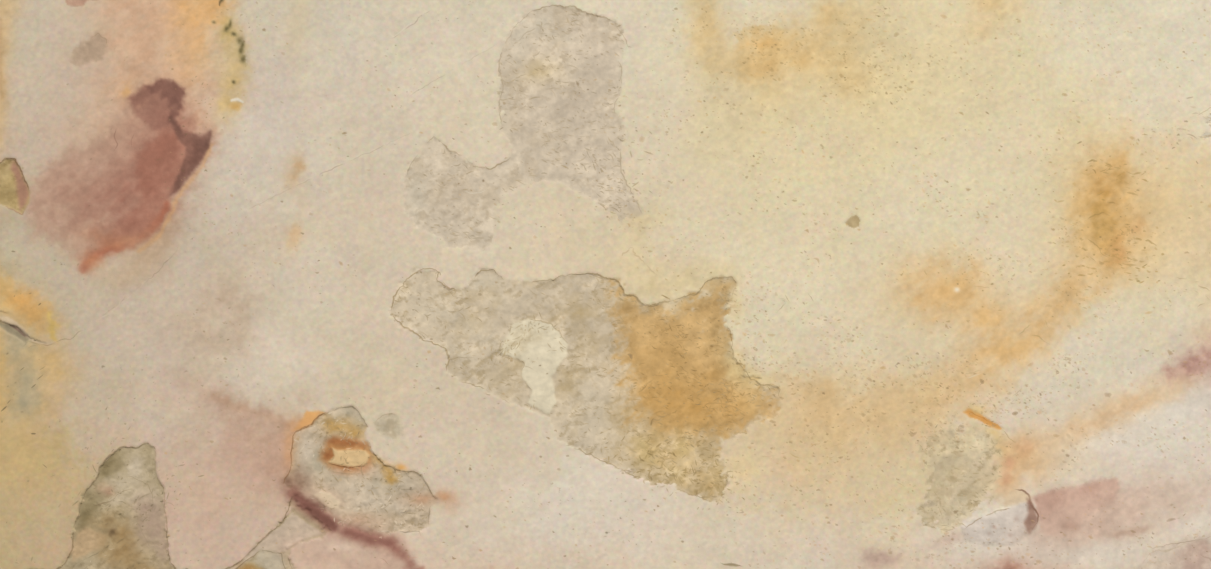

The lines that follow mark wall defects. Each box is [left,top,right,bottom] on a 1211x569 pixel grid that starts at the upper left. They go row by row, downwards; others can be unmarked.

flaking render [0,157,30,215]
peeling [15,419,204,569]
damp [23,0,252,293]
peeling [225,405,435,569]
peeling [402,5,653,253]
peeling [389,268,792,510]
damp [847,203,1211,569]
corrosion [874,112,1188,456]